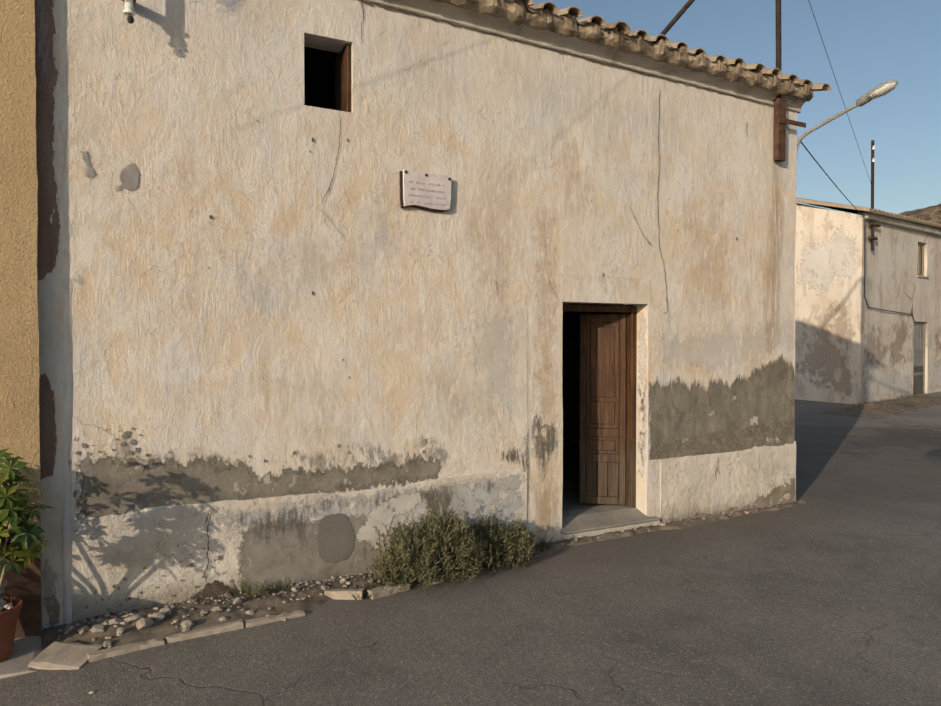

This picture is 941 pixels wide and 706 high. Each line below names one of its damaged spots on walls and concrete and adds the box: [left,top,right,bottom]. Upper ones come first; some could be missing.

crack [319,114,343,235]
crack [360,0,793,322]
peeling [40,373,57,480]
crack [204,509,218,585]
peeling [43,428,443,648]
leakage [214,420,557,549]
peeling [649,353,795,460]